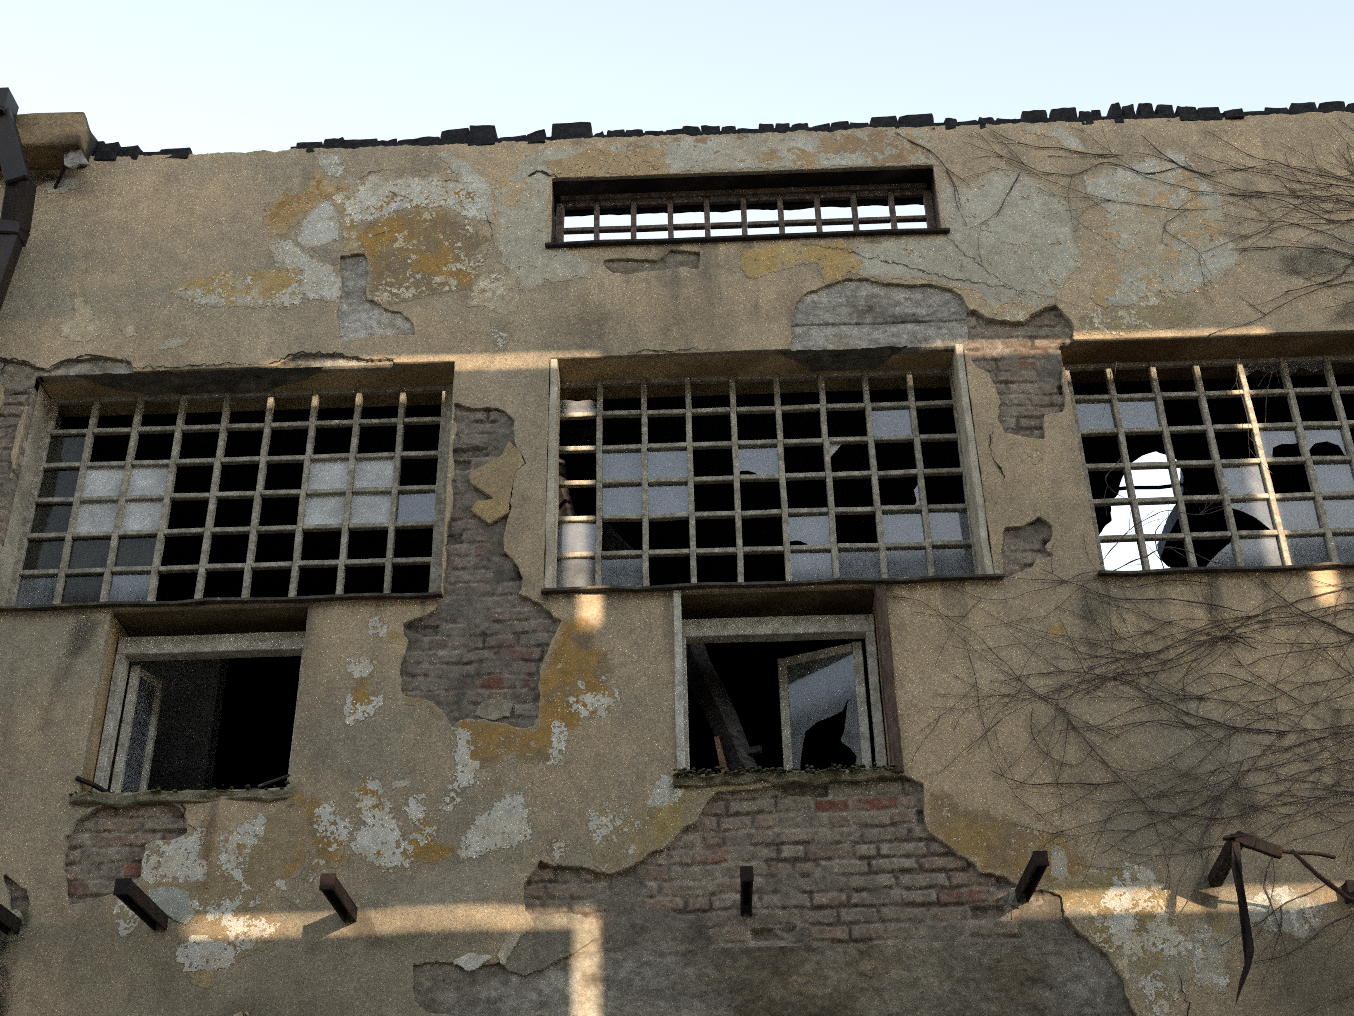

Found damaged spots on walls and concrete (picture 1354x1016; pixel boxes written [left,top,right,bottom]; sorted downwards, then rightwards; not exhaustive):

peeling [1022,124,1089,157]
peeling [0,129,940,547]
peeling [740,149,1244,439]
flaking render [1001,519,1052,578]
flaking render [65,405,622,989]
flaking render [413,774,1328,1016]